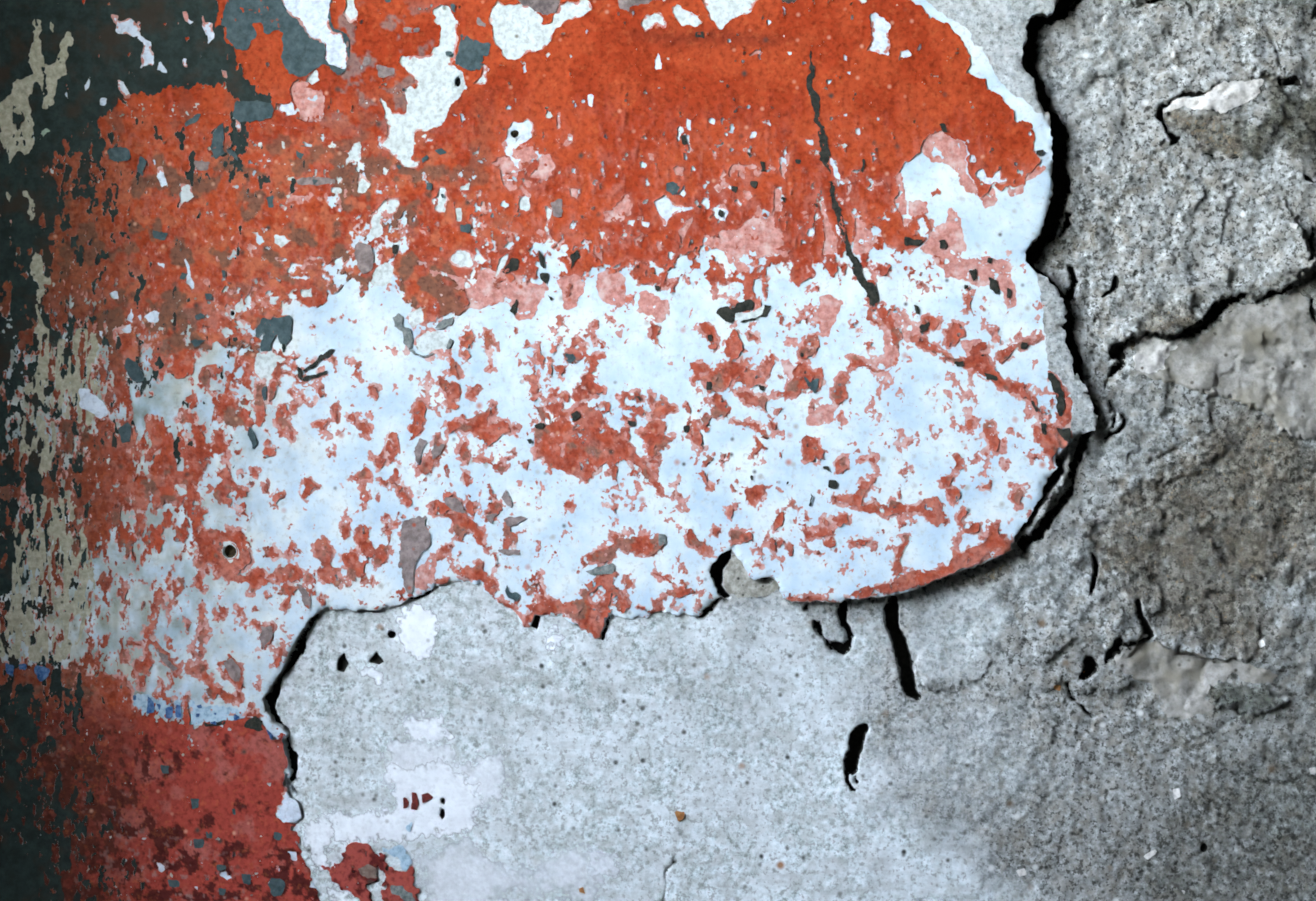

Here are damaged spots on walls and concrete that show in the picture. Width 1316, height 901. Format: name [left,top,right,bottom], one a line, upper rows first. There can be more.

peeling [641,0,755,38]
peeling [0,19,74,163]
peeling [188,0,591,175]
crack [1017,0,1316,553]
peeling [0,142,1073,740]
crack [1090,553,1099,593]
crack [804,600,854,655]
crack [884,595,921,700]
crack [1066,683,1091,714]
crack [1105,599,1154,663]
spalling [844,723,869,791]
peeling [321,792,445,901]